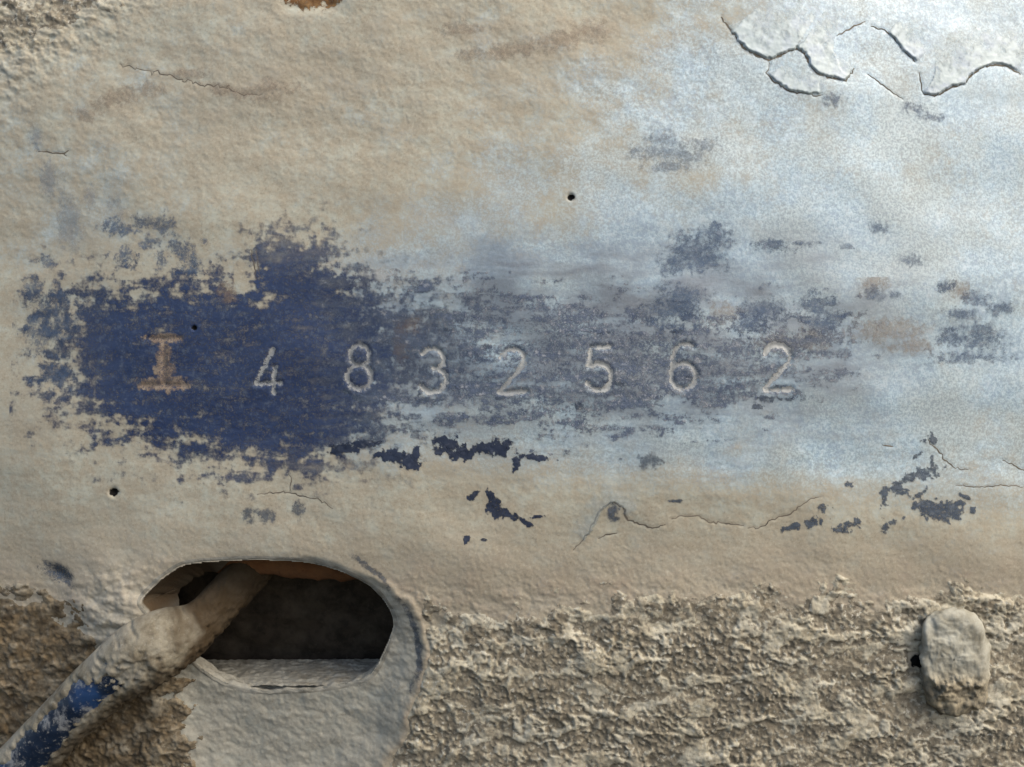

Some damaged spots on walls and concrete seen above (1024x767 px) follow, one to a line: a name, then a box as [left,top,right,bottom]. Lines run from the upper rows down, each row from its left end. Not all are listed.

crack [121,64,261,96]
crack [721,17,1021,99]
peeling [928,284,1013,363]
peeling [17,214,861,489]
peeling [467,488,545,527]
crack [573,497,818,550]
peeling [781,503,861,533]
peeling [879,431,976,533]
crack [928,439,1024,488]